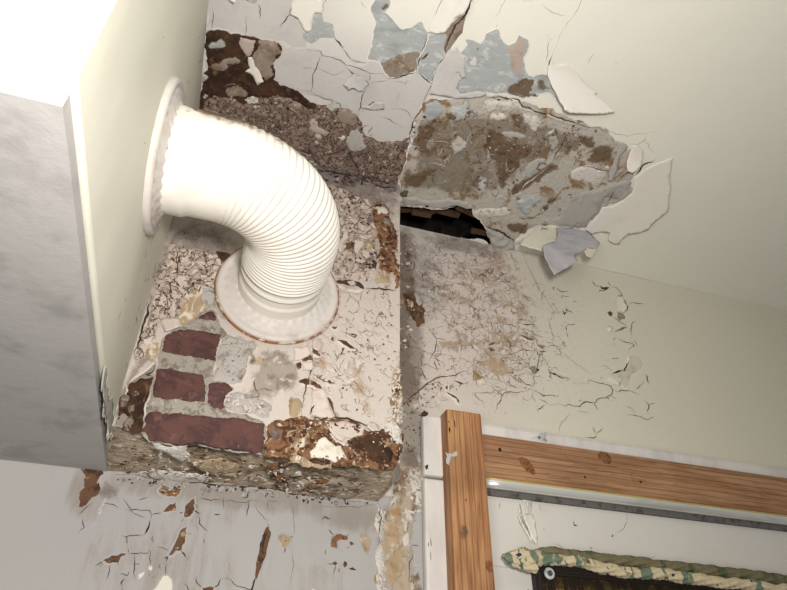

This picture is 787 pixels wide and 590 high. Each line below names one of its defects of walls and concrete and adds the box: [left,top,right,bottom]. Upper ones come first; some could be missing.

peeling [199,0,615,283]
crack [390,0,472,185]
flaking render [101,244,374,505]
corrosion [263,367,404,471]
crack [400,327,469,411]
crack [470,254,653,438]
peeling [152,574,174,590]
crack [97,474,296,590]
flaking render [360,503,404,590]